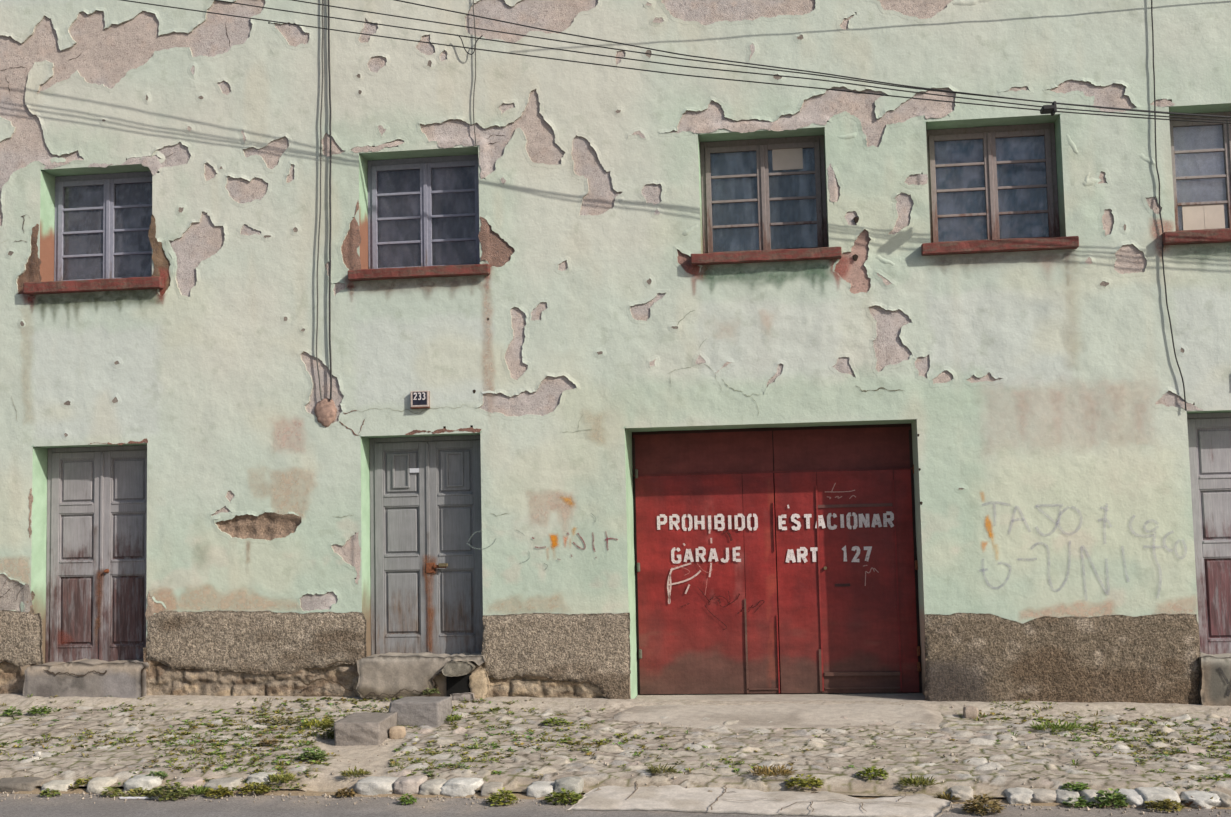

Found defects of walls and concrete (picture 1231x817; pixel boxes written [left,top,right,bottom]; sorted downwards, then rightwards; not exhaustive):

peeling [461,0,602,47]
peeling [642,0,820,63]
peeling [836,0,957,34]
peeling [625,83,960,152]
peeling [0,0,313,301]
peeling [317,85,666,220]
leakage [35,289,155,305]
peeling [827,163,1007,388]
peeling [406,298,581,435]
spalling [207,486,306,545]
spalling [0,570,35,615]